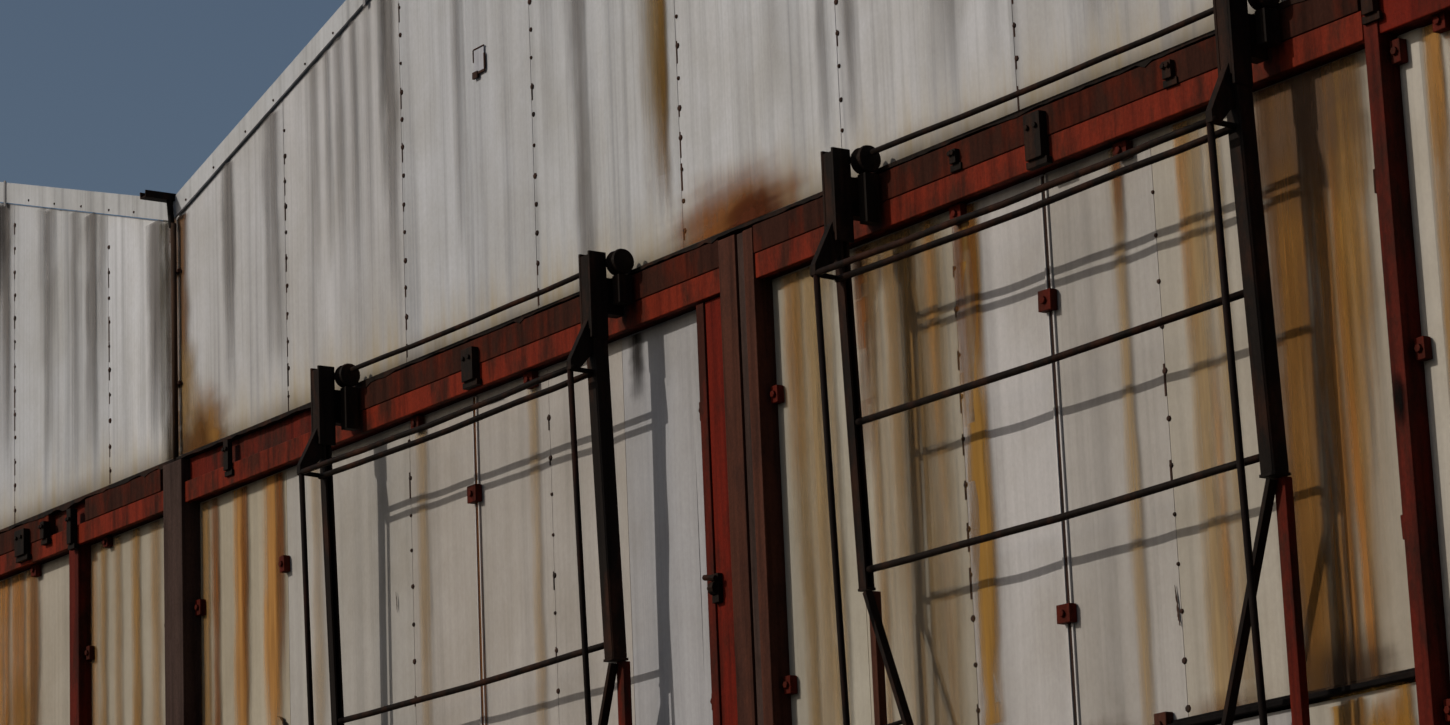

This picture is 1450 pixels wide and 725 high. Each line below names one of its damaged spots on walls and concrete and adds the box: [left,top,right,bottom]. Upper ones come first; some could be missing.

rust [646,0,665,131]
damp [0,203,9,394]
rust [165,214,221,460]
damp [224,161,233,315]
rust [682,179,795,245]
rust [954,203,1000,725]
rust [1254,56,1415,725]
rust [1424,24,1450,374]
rust [0,573,37,725]
rust [202,486,247,725]
rust [264,472,284,725]